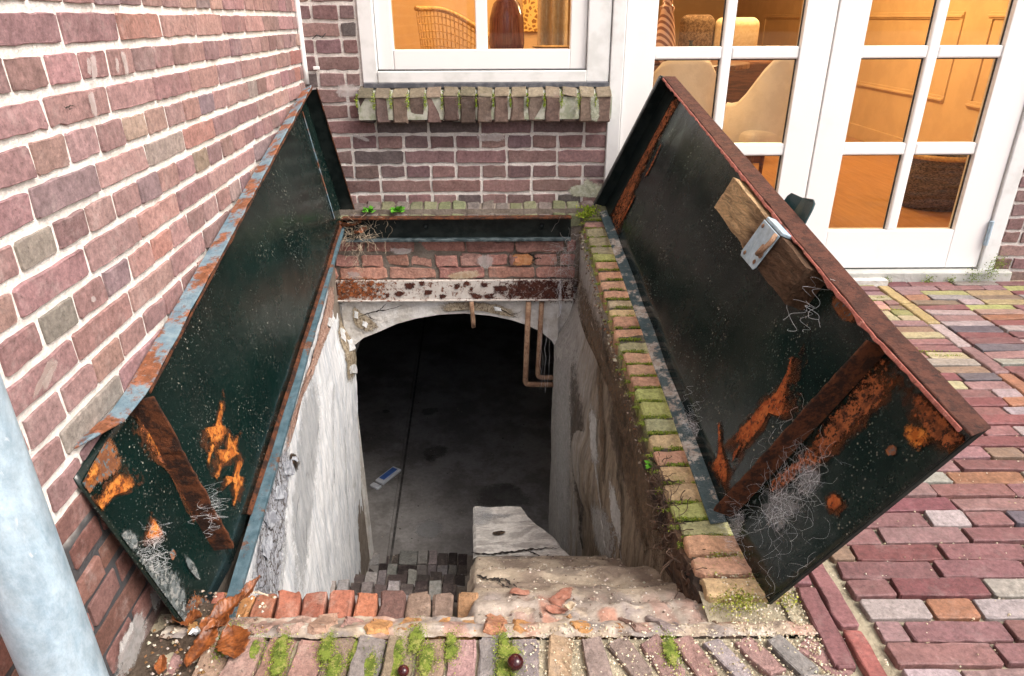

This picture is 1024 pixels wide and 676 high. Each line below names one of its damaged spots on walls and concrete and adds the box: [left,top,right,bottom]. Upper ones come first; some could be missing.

rust [611,96,680,236]
rust [336,277,579,303]
rust [83,438,145,512]
rust [140,512,176,560]
rust [131,411,195,523]
rust [200,391,246,508]
flaking render [252,287,378,595]
crack [471,547,557,589]
rust [708,348,808,495]
rust [825,492,848,518]
rust [770,358,966,492]